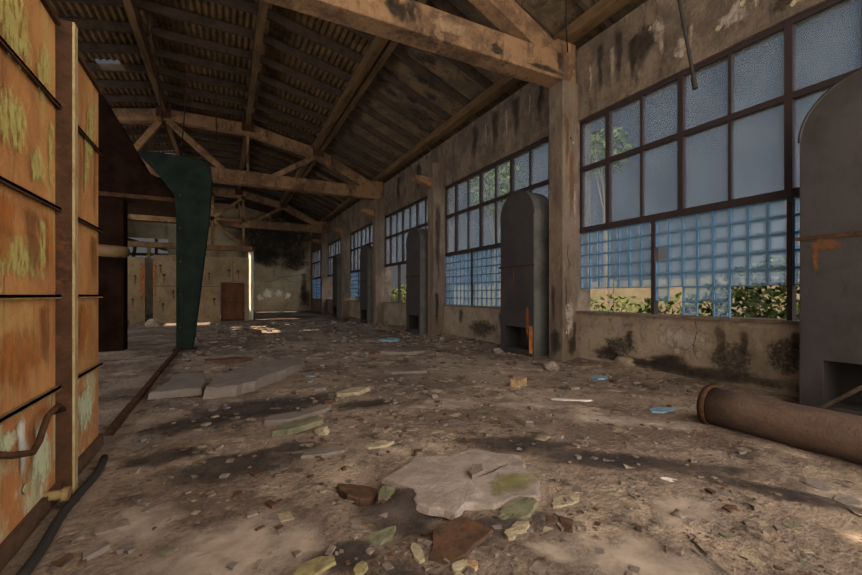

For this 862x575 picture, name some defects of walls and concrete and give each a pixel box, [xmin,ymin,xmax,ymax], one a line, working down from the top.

peeling [715,0,746,31]
leakage [589,28,654,93]
leakage [472,86,543,155]
leakage [596,321,800,387]